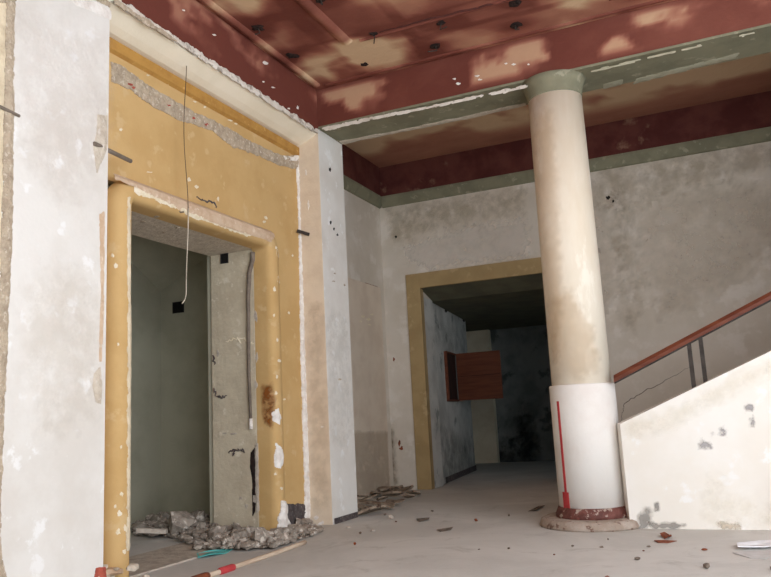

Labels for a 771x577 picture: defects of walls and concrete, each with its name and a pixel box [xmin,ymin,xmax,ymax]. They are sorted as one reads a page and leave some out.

crack [380,0,509,33]
rust [263,386,274,425]